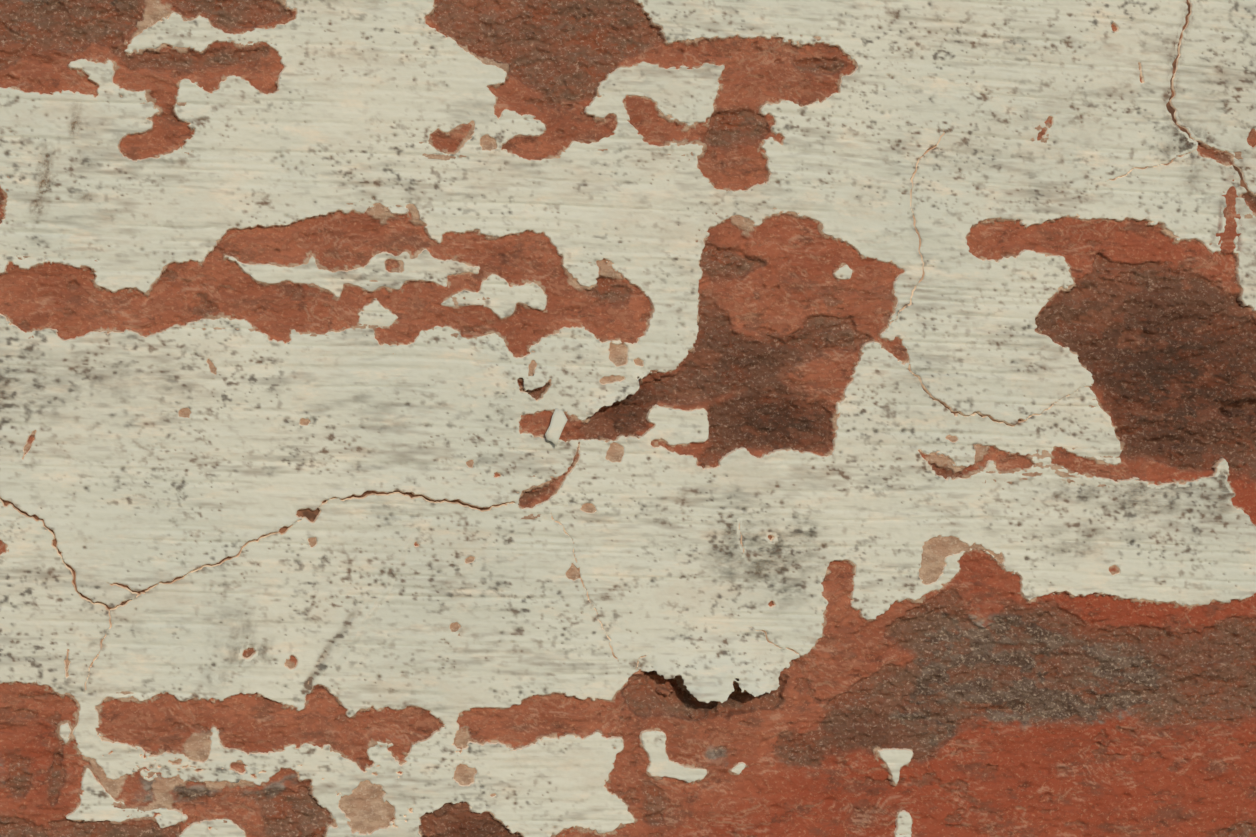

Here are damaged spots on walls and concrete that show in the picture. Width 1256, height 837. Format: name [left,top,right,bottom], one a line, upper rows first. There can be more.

peeling [0,176,10,224]
peeling [0,0,297,161]
peeling [419,0,856,192]
peeling [1030,113,1057,144]
crack [1113,0,1199,180]
crack [1233,166,1249,191]
peeling [0,198,909,520]
crack [923,389,1021,426]
peeling [918,127,1256,526]
crack [0,490,519,609]
peeling [0,535,1256,837]